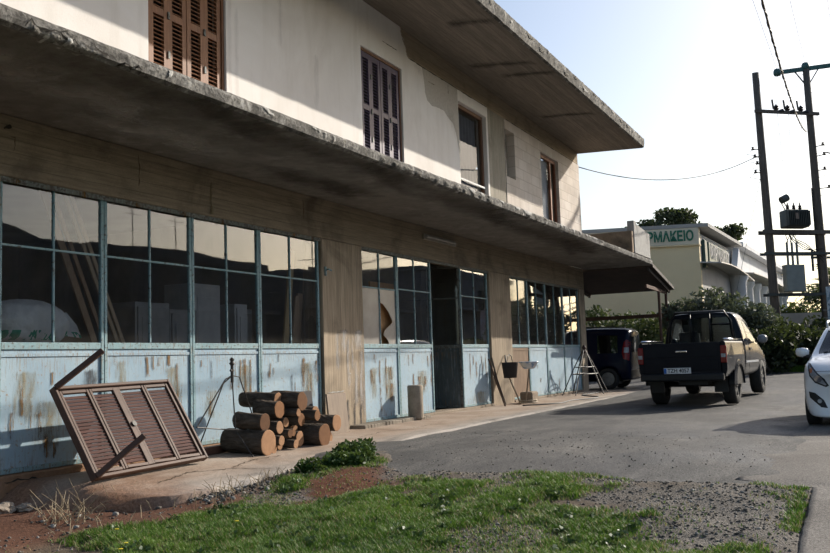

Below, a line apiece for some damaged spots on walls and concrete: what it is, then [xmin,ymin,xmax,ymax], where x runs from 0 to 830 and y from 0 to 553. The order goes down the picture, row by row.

peeling [422,67,460,152]
rust [146,355,182,402]
rust [235,358,257,392]
rust [371,354,394,410]
rust [9,373,56,458]
crack [159,455,281,483]